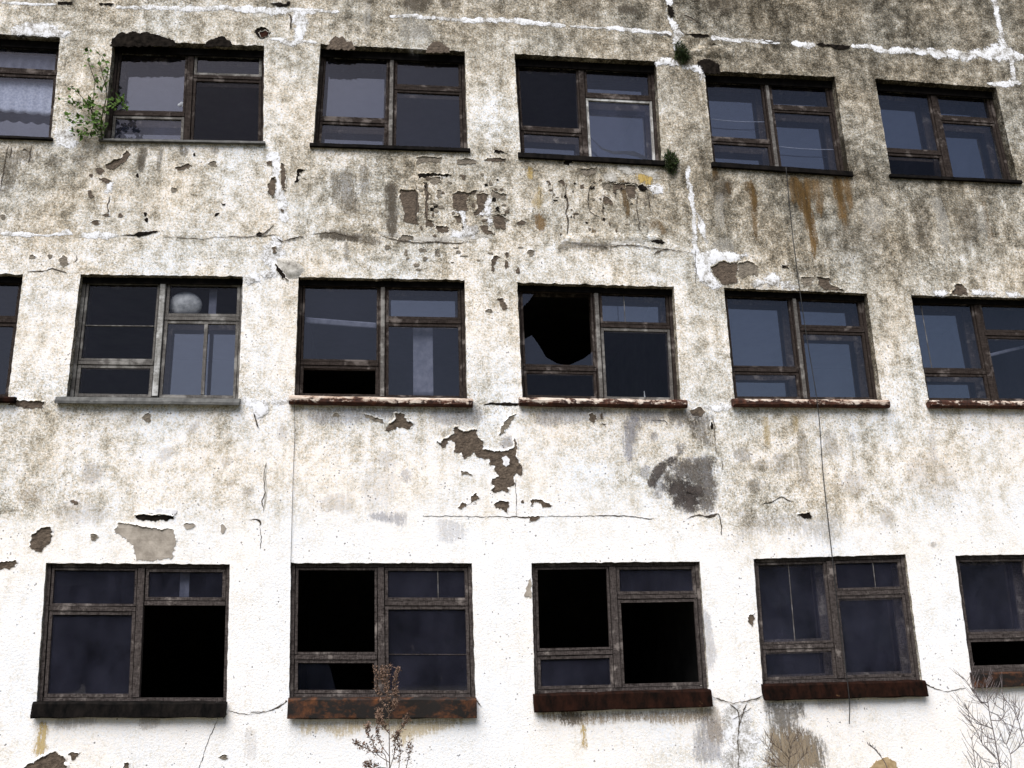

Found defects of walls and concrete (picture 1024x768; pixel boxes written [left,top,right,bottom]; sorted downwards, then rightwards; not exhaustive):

crack [57,0,114,8]
crack [270,1,292,28]
flaking render [110,31,176,48]
crack [120,224,493,244]
flaking render [384,149,535,274]
corrosion [793,181,818,255]
corrosion [833,177,853,222]
peeling [435,413,552,522]
crack [426,481,653,519]
leakage [647,446,717,512]
peeling [28,525,54,553]
peeling [113,508,196,563]